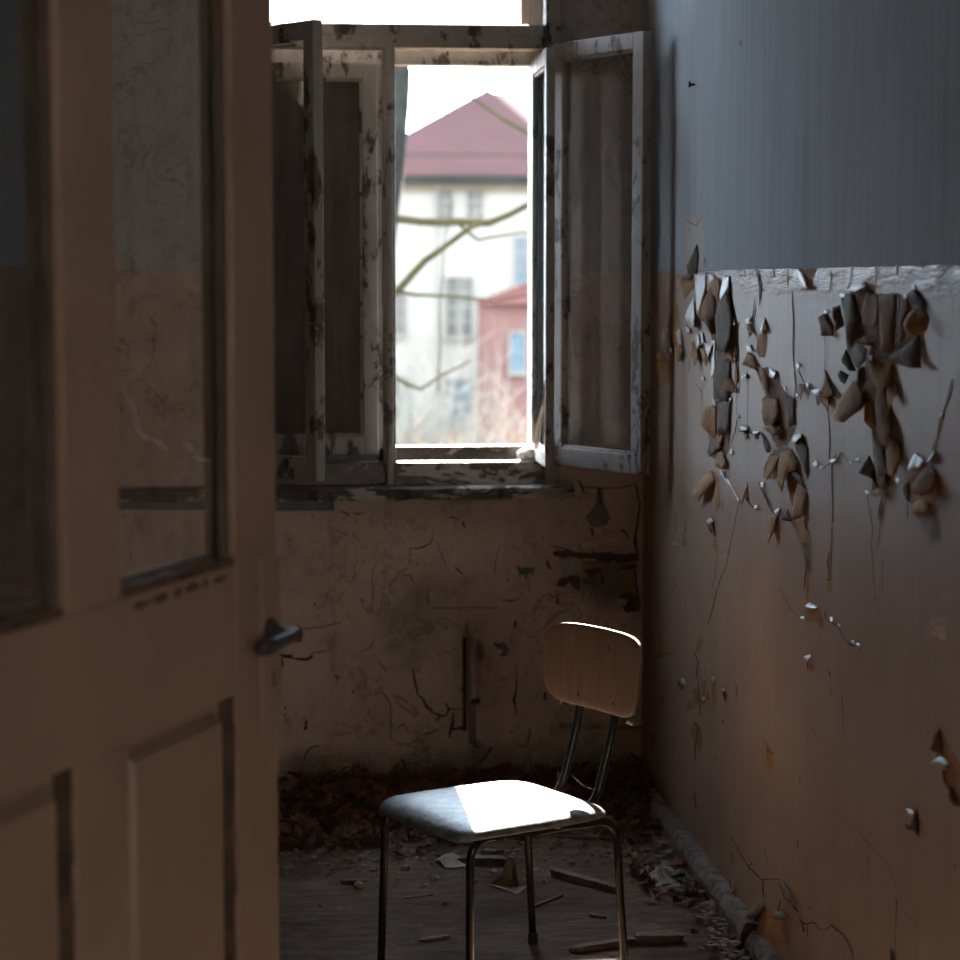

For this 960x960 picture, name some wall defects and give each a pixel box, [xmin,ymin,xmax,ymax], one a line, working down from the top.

peeling [797,267,816,291]
peeling [655,216,810,553]
peeling [818,282,953,521]
peeling [586,489,610,536]
crack [561,480,641,556]
crack [402,516,520,609]
flaking render [542,537,641,613]
crack [281,650,330,668]
crack [335,640,463,738]
peeling [930,727,960,807]
spalling [905,808,927,838]